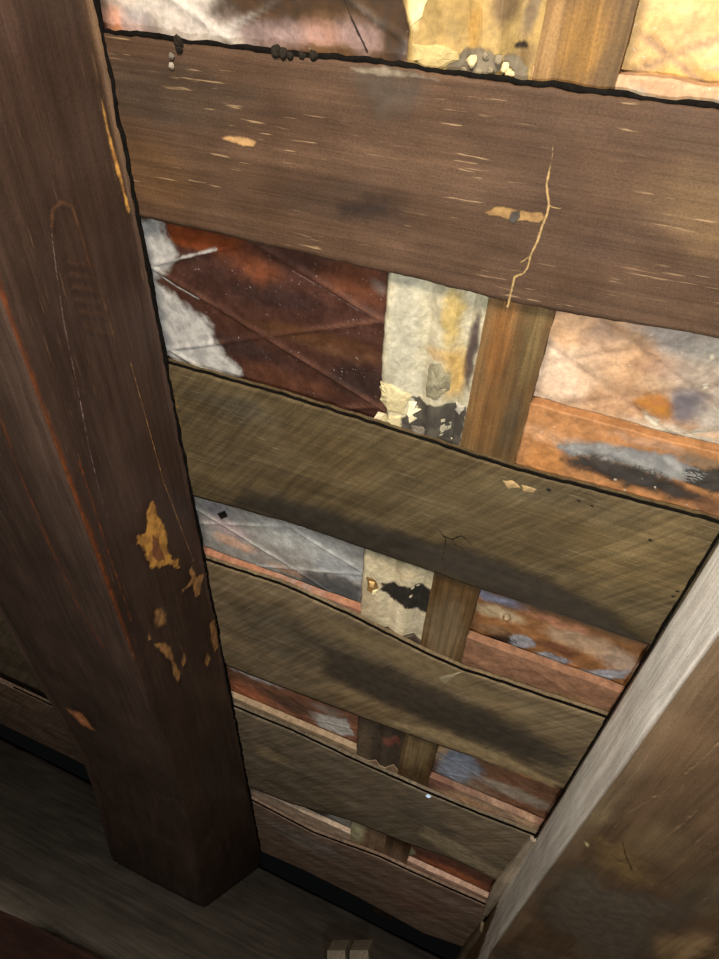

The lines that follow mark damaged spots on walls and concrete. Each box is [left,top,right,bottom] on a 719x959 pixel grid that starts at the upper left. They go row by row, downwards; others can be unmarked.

spalling [486,207,544,223]
crack [507,149,560,308]
peeling [137,501,204,597]
peeling [156,609,166,625]
peeling [148,634,186,681]
peeling [205,621,218,666]